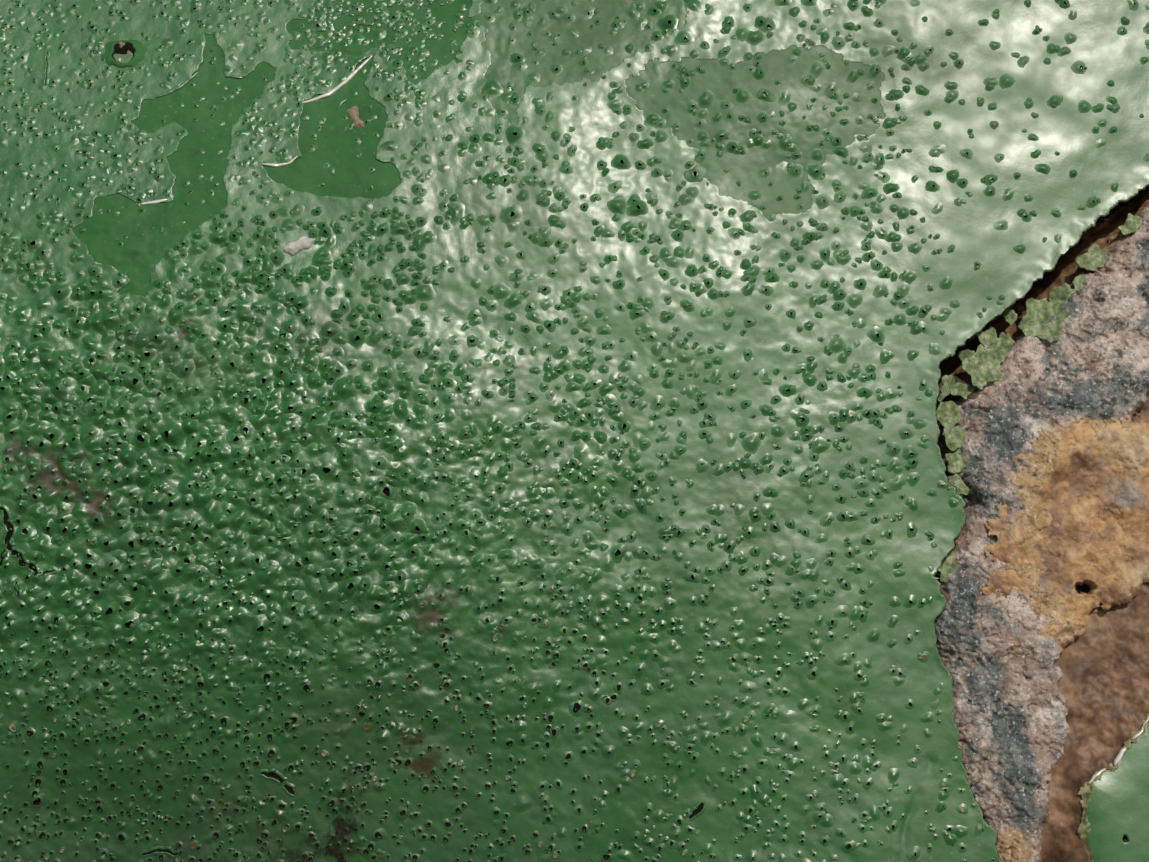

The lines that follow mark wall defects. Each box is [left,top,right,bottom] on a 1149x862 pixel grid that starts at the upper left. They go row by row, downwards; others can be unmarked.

peeling [73,34,275,297]
peeling [263,0,474,199]
crack [0,504,58,596]
spalling [934,186,1149,862]